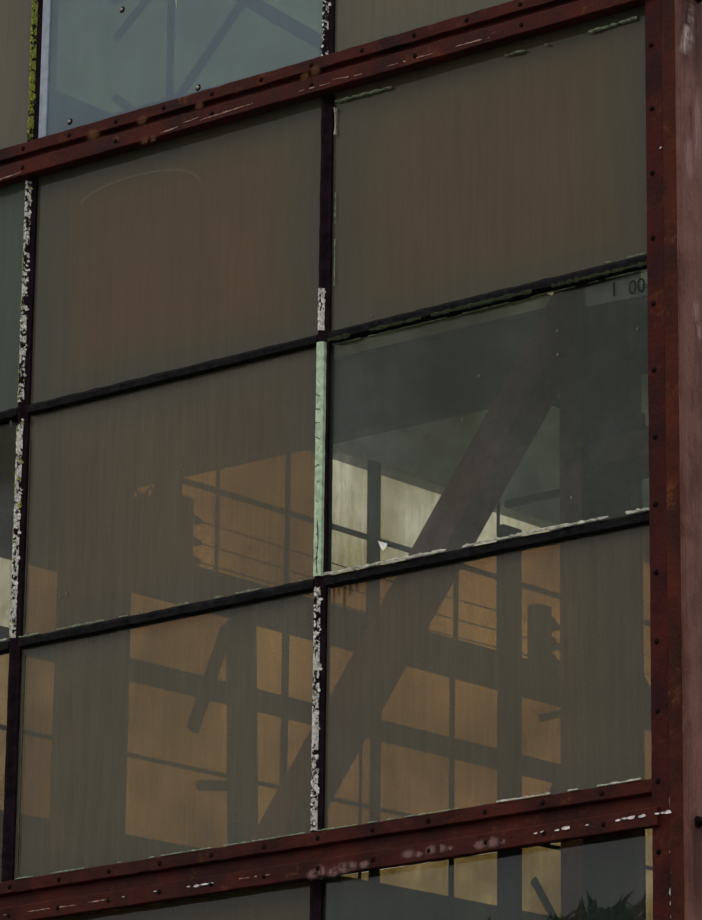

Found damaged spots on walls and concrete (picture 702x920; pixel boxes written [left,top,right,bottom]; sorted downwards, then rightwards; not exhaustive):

peeling [17,180,33,402]
peeling [318,288,326,330]
peeling [9,418,24,638]
peeling [310,587,323,831]